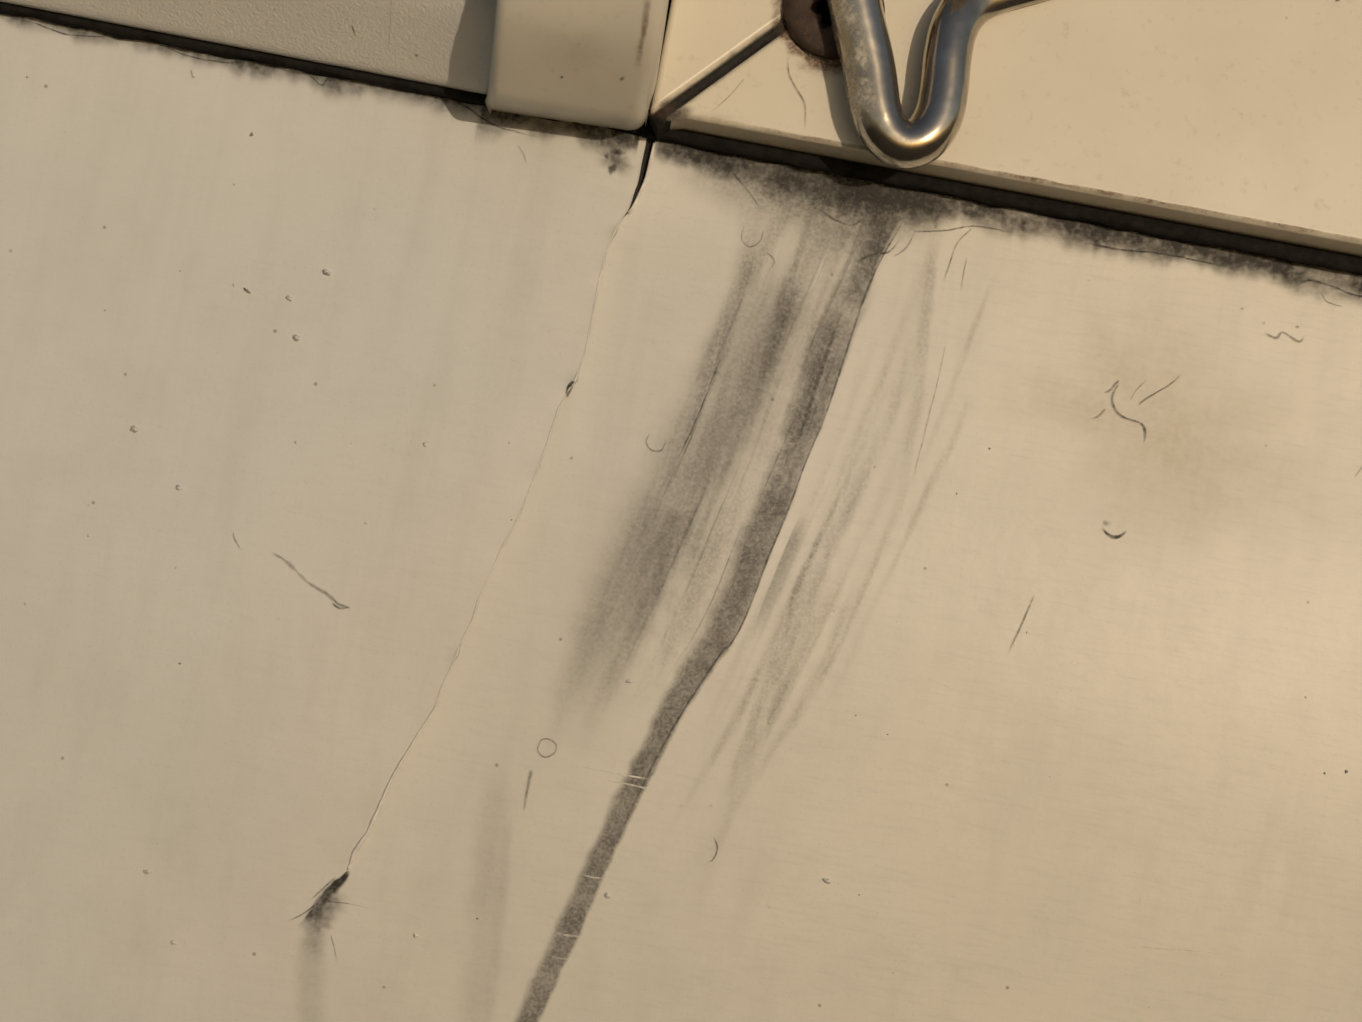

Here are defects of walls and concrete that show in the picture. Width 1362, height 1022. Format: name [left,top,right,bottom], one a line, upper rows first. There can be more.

crack [298,139,656,918]
water stain [855,221,894,292]